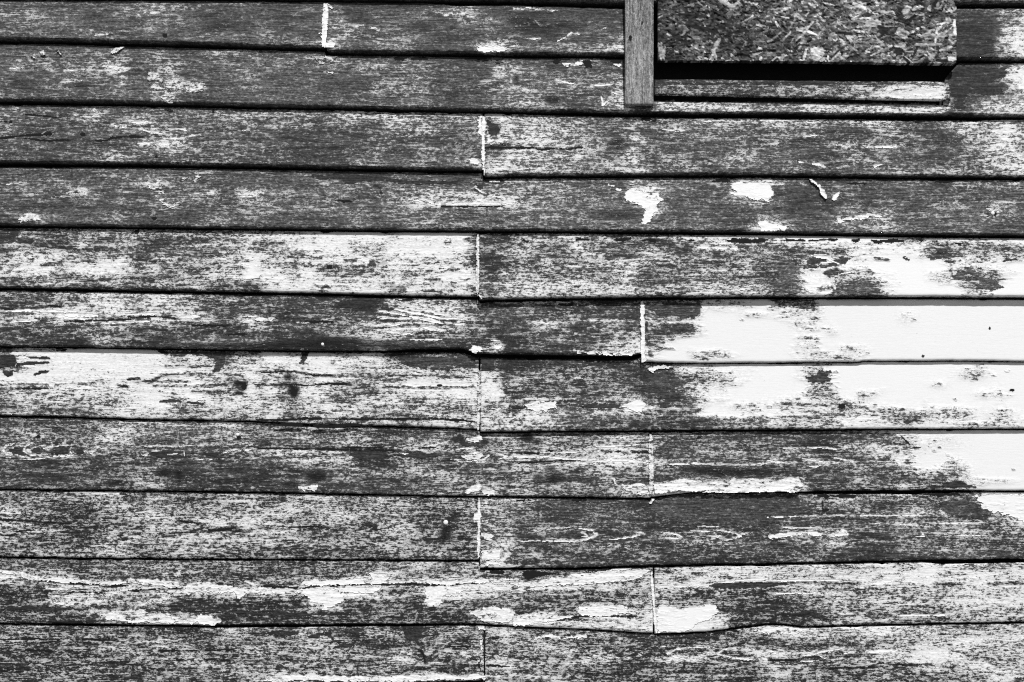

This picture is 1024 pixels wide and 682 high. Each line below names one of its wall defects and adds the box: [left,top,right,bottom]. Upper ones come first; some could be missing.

peeling [608,183,664,224]
peeling [712,178,774,202]
peeling [810,179,840,200]
spalling [726,220,838,243]
peeling [768,256,880,295]
peeling [918,239,1004,291]
peeling [645,300,702,330]
peeling [0,349,67,377]
peeling [157,350,226,372]
peeling [806,370,832,384]
peeling [0,519,650,630]
peeling [469,604,636,640]